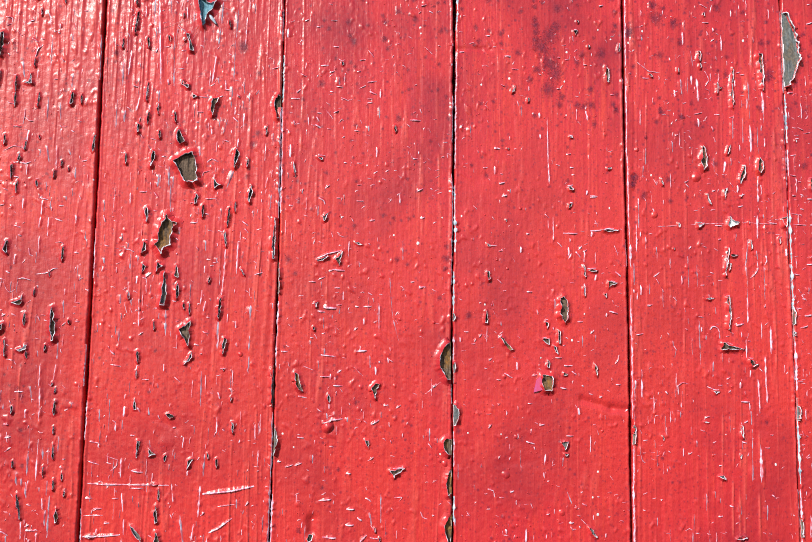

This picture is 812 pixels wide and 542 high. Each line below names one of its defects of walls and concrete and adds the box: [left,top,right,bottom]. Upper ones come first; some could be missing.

peeling [183,0,223,55]
peeling [134,83,162,136]
peeling [179,78,223,120]
peeling [777,8,805,188]
peeling [147,112,224,217]
peeling [138,204,196,367]
peeling [534,291,573,396]
peeling [433,337,463,542]